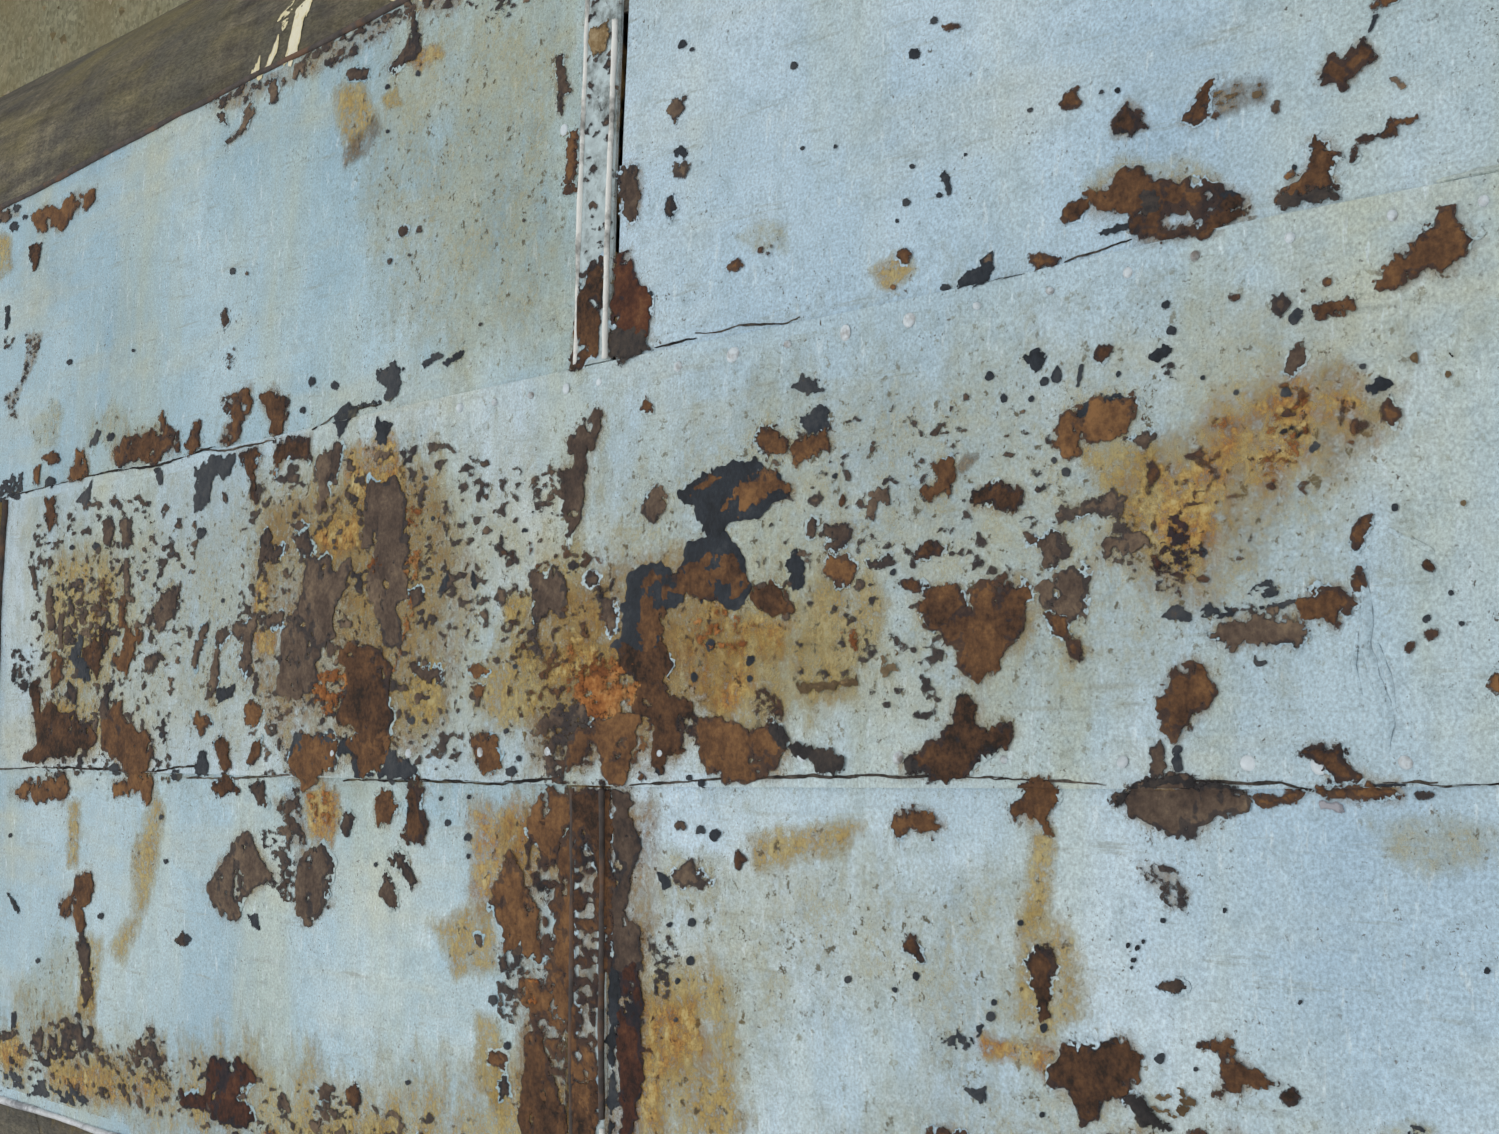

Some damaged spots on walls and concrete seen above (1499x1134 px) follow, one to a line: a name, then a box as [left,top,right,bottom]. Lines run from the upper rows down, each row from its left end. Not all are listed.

peeling [1099,223,1129,236]
peeling [978,250,995,285]
peeling [1028,252,1064,272]
corrosion [568,250,655,372]
corrosion [898,204,1487,785]
peeling [794,587,947,720]
corrosion [0,373,882,1134]
corrosion [1107,660,1435,842]
crack [757,772,929,780]
crack [965,776,1103,785]
crack [1196,780,1314,792]
crack [1382,780,1499,788]